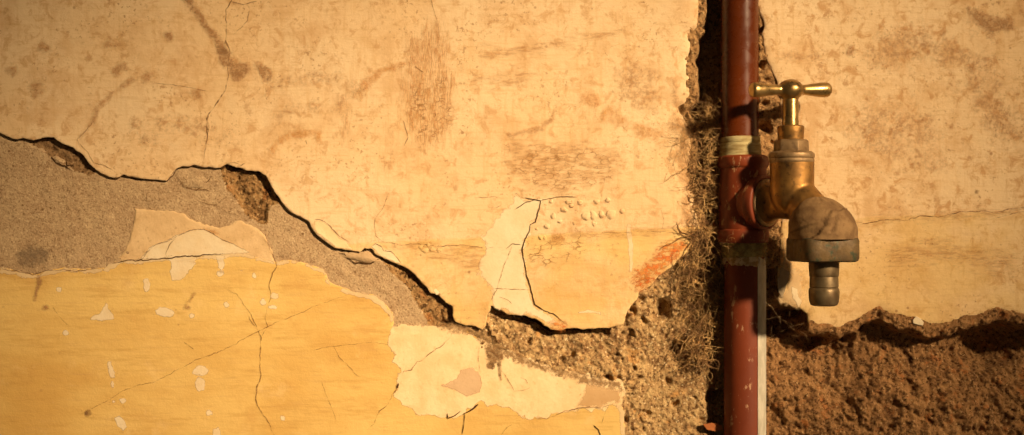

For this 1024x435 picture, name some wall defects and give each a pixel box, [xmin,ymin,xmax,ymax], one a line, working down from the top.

spalling [759,12,782,176]
crack [2,0,349,427]
spalling [0,0,724,435]
crack [289,151,611,332]
rust [635,242,686,288]
spalling [766,219,1024,435]